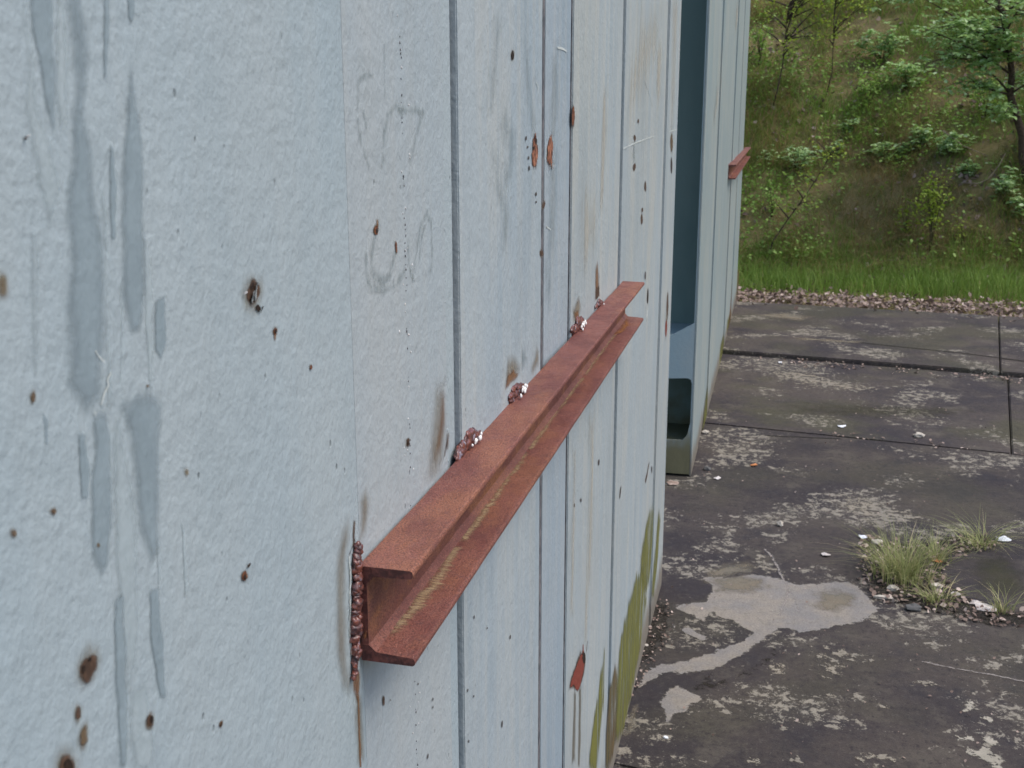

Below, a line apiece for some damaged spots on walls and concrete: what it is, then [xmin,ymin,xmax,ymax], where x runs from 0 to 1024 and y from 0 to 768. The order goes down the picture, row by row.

rust [532,133,554,169]
rust [244,279,264,313]
water stain [28,0,166,768]
rust [506,363,517,387]
rust [340,522,355,615]
water stain [573,507,660,768]
rust [80,655,97,683]
rust [570,654,585,692]
rust [76,707,88,745]
rust [60,755,75,768]